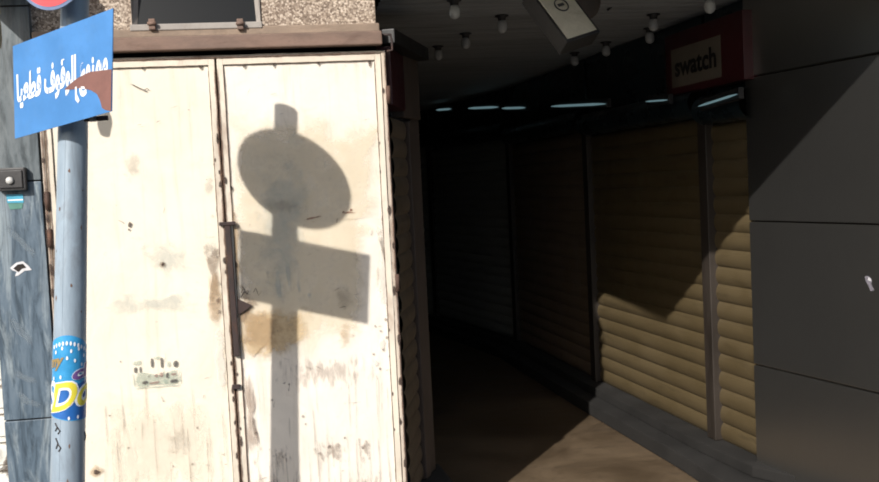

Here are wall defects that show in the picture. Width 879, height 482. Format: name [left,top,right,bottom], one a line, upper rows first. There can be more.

corrosion [113,53,407,482]